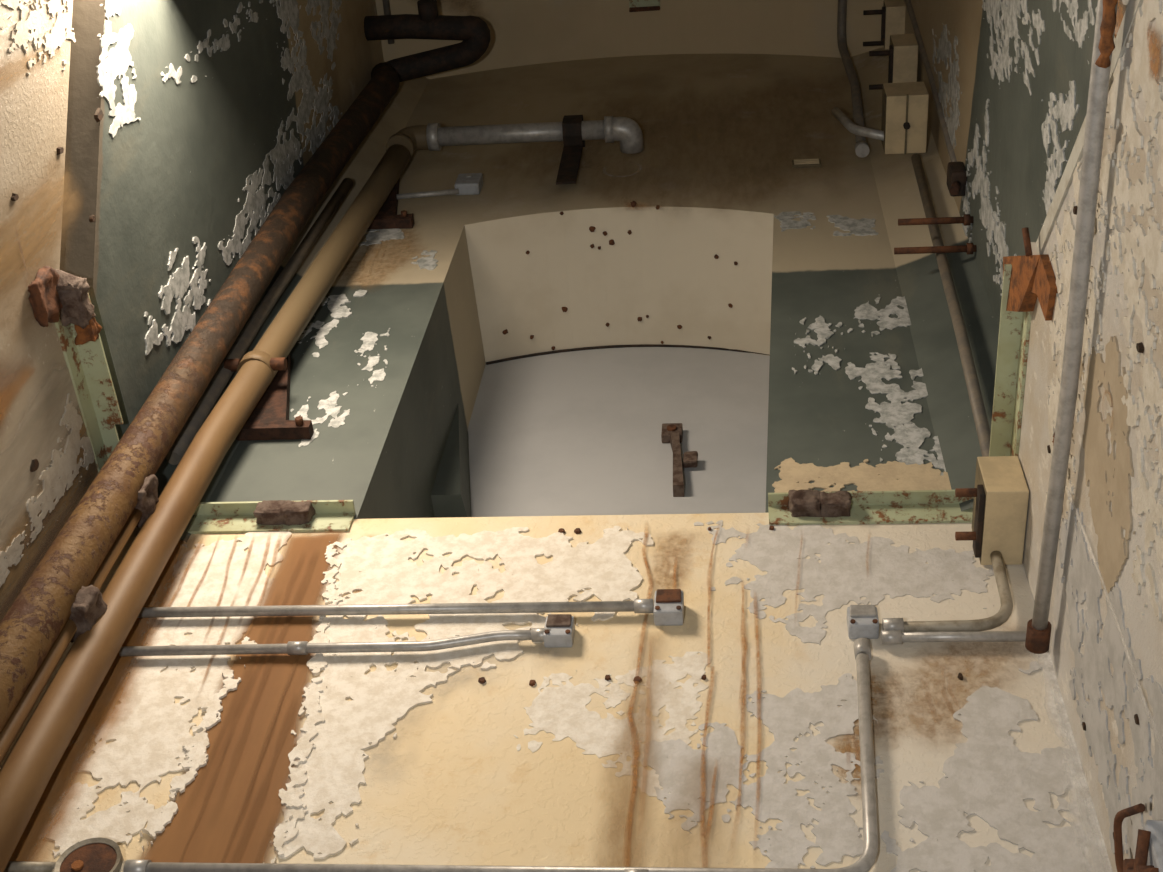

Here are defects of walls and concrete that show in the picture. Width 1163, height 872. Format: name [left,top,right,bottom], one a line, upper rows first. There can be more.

damp [0,369,78,521]
peeling [94,0,141,138]
peeling [144,0,342,355]
peeling [290,328,391,447]
peeling [772,296,952,493]
peeling [982,0,1097,461]
peeling [1058,0,1163,859]
peeling [47,531,292,858]
rust [141,532,341,863]
peeling [271,526,654,864]
peeling [514,652,884,869]
damp [837,719,861,782]